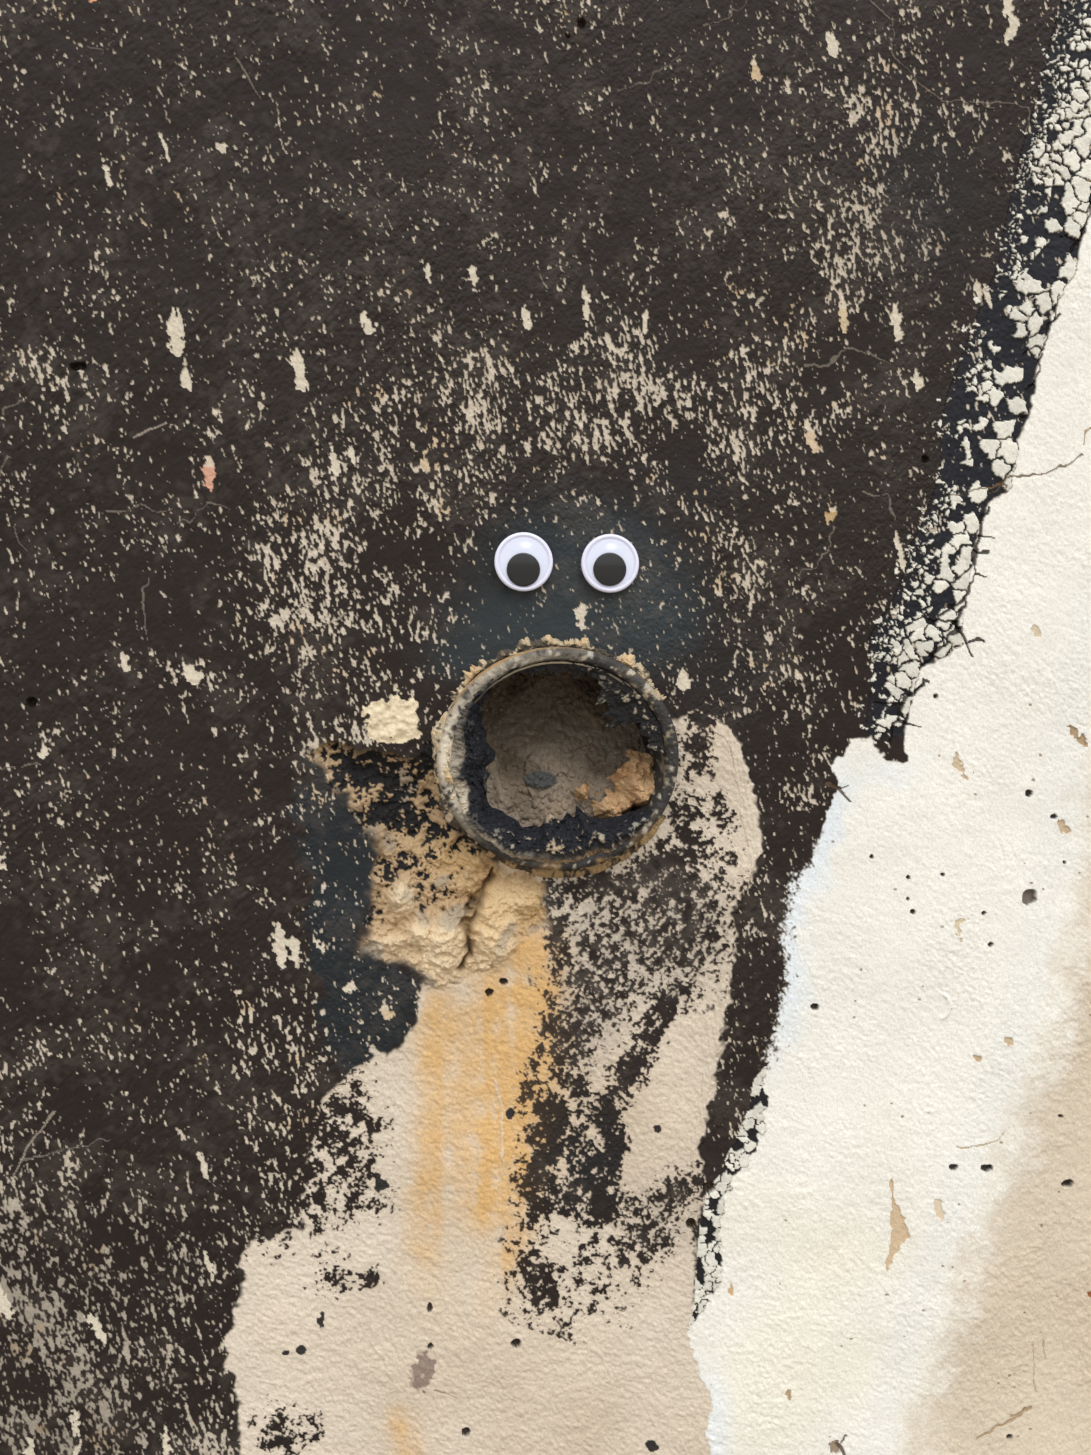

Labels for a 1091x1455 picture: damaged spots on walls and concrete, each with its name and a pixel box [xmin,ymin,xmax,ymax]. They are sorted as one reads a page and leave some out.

peeling [1002,0,1021,46]
crack [618,56,680,93]
peeling [815,29,981,334]
peeling [974,279,993,309]
peeling [890,304,905,342]
crack [804,348,891,369]
peeling [913,368,924,392]
crack [859,0,1091,744]
crack [798,526,835,579]
peeling [894,531,907,574]
peeling [223,584,821,1455]
corrosion [393,924,578,1318]